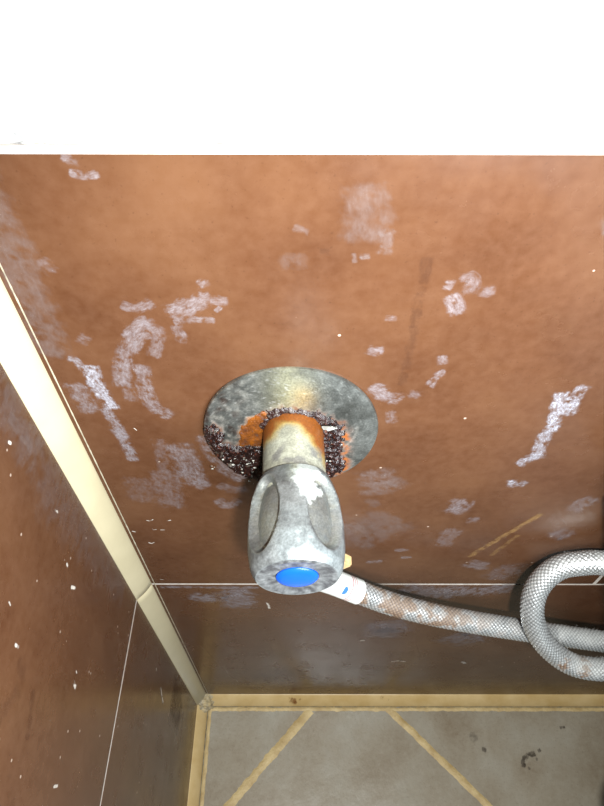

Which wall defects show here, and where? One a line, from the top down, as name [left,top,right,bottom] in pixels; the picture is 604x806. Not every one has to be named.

rust [203,407,346,481]